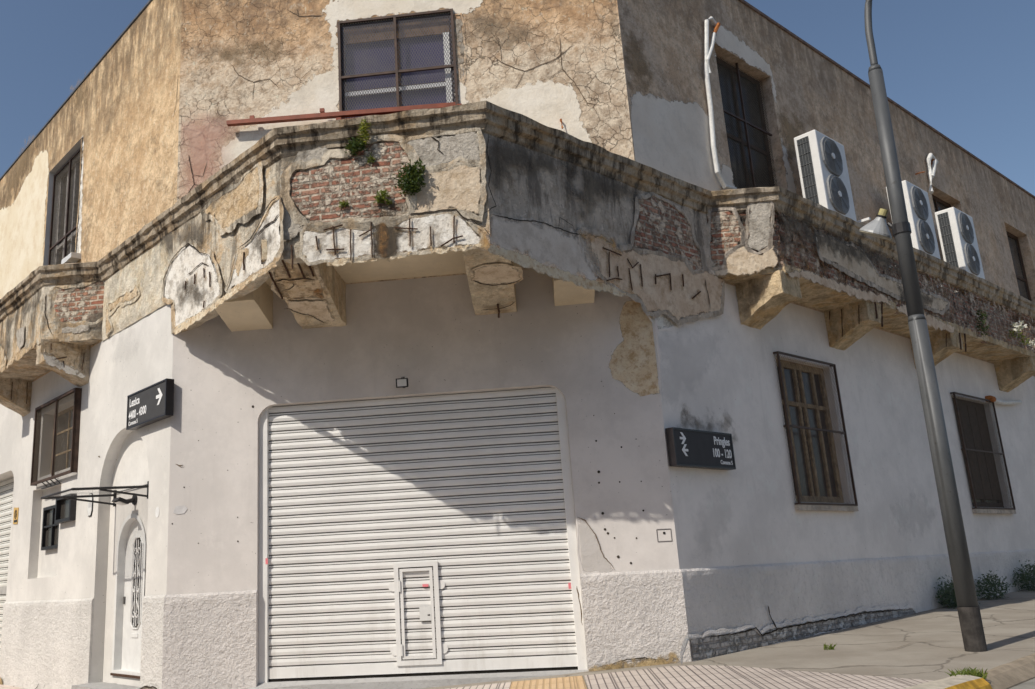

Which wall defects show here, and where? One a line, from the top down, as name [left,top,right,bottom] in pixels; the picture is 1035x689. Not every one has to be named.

crack [230,65,279,91]
crack [493,35,598,105]
water stain [487,139,638,217]
flaking render [162,133,908,399]
water stain [784,217,900,272]
flaking render [0,281,140,378]
flaking render [920,288,967,352]